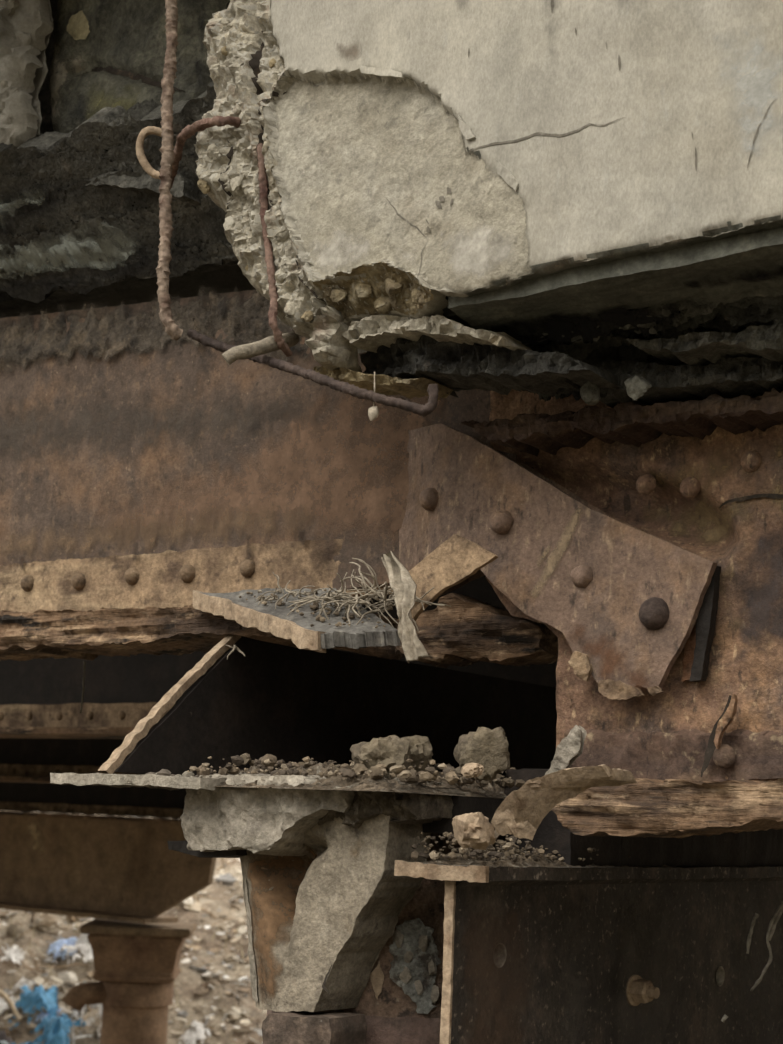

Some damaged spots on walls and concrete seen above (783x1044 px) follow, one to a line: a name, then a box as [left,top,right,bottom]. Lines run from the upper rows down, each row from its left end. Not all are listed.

crack [463,117,625,156]
crack [747,97,777,170]
peeling [136,0,783,417]
corrosion [0,394,443,568]
crack [719,493,783,508]
corrosion [532,509,581,596]
spalling [317,782,466,828]
peeling [244,878,258,1002]
peeling [370,918,441,1014]